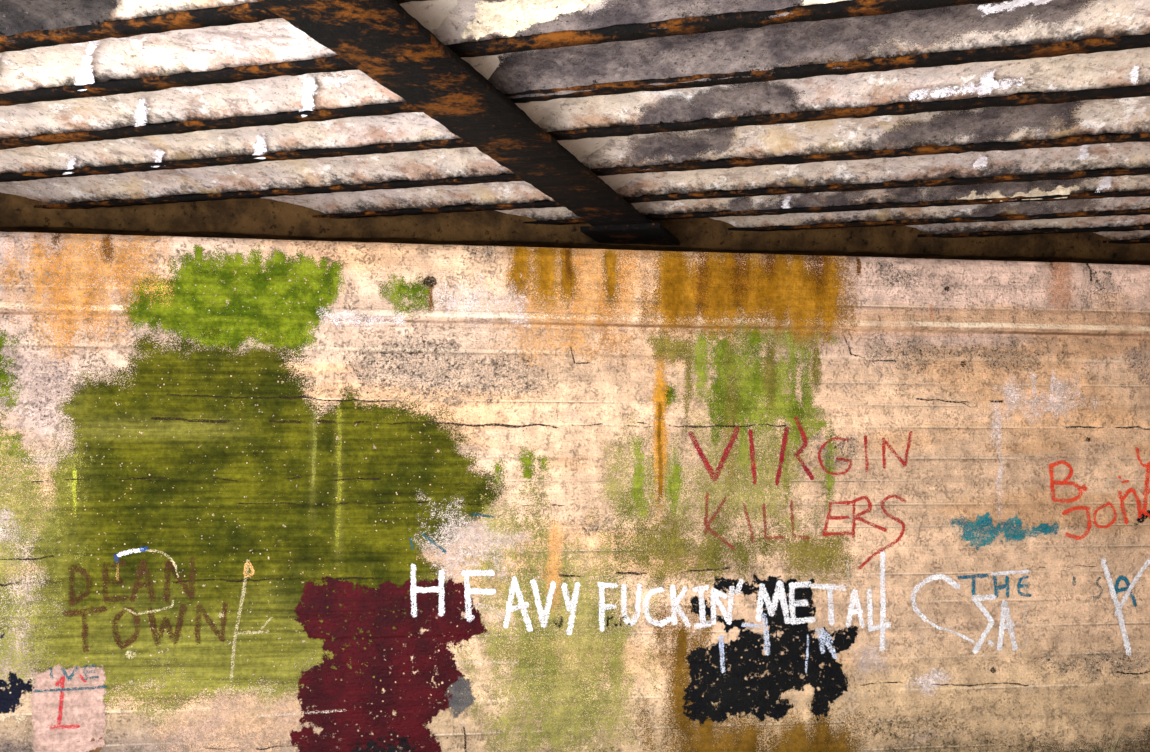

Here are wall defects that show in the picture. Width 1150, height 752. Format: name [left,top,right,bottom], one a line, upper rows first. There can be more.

rust [0,232,175,371]
water stain [192,244,204,274]
water stain [230,250,246,294]
water stain [269,249,407,343]
rust [485,247,861,523]
water stain [681,327,837,514]
water stain [335,406,343,547]
water stain [145,687,323,752]
water stain [904,668,951,696]
water stain [1009,726,1150,752]